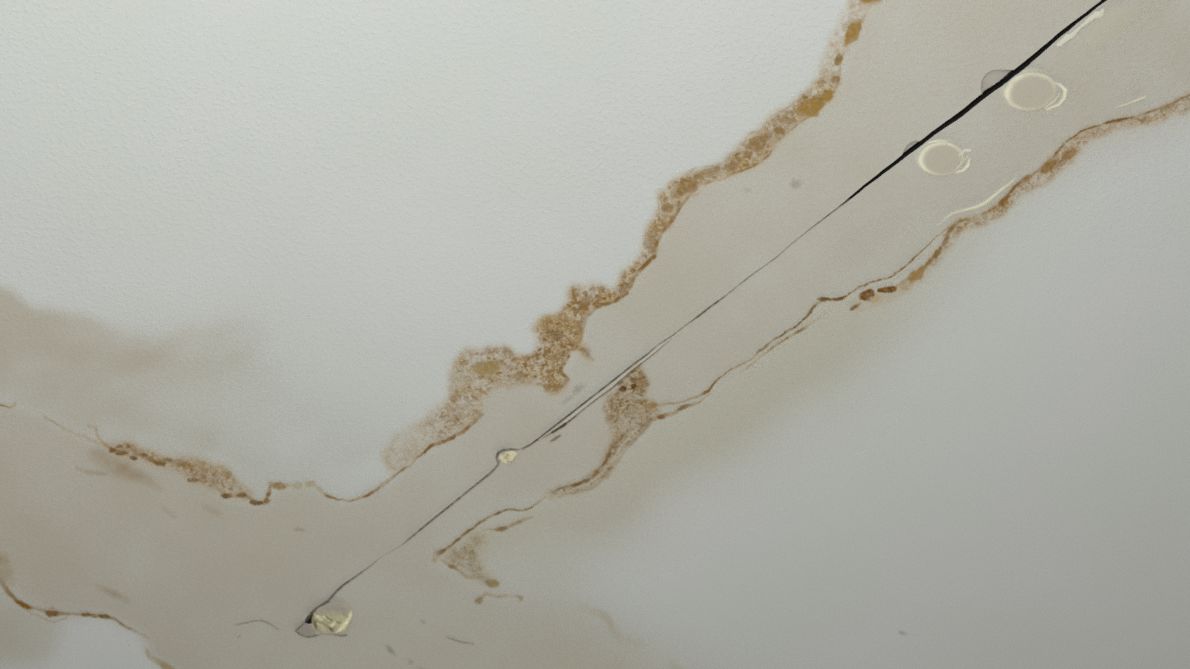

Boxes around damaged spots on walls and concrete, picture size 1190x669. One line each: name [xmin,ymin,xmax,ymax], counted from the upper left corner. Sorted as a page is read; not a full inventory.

leakage [781,78,834,126]
crack [808,0,1107,231]
leakage [725,115,779,175]
leakage [659,166,724,213]
leakage [983,171,1038,216]
leakage [558,287,629,342]
leakage [618,254,656,290]
leakage [858,276,896,300]
leakage [439,316,588,434]
crack [524,256,778,448]
crack [408,461,500,540]
crack [310,570,364,614]